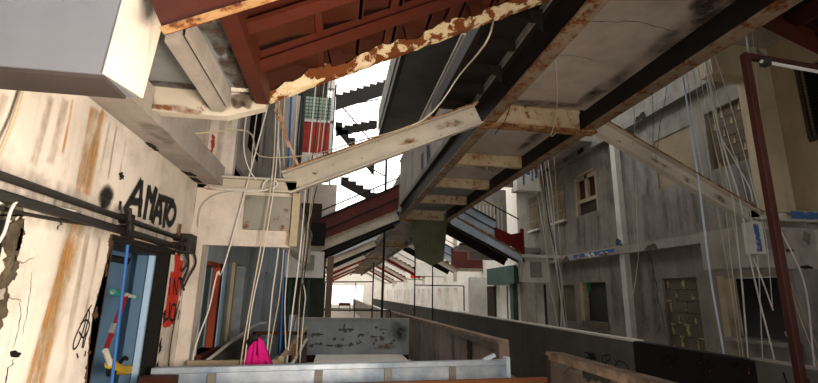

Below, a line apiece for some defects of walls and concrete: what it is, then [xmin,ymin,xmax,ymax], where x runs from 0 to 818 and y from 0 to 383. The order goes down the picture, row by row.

corrosion [78,109,104,194]
spalling [0,201,25,330]
corrosion [29,238,73,383]
peeling [308,324,406,349]